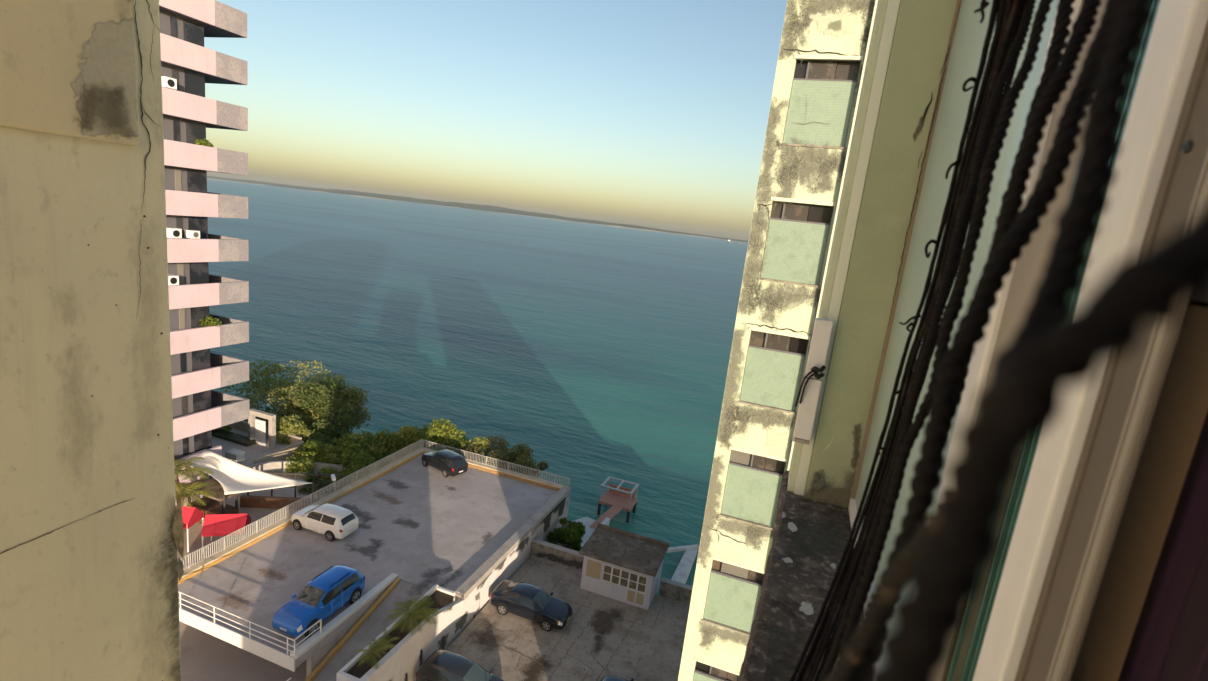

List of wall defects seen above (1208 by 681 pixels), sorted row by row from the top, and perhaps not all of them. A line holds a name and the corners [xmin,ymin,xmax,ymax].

peeling [71,20,138,137]
crack [134,0,159,312]
water stain [739,100,846,323]
water stain [779,0,874,59]
crack [888,4,960,327]
crack [0,498,134,554]
water stain [698,330,798,568]
water stain [805,424,861,508]